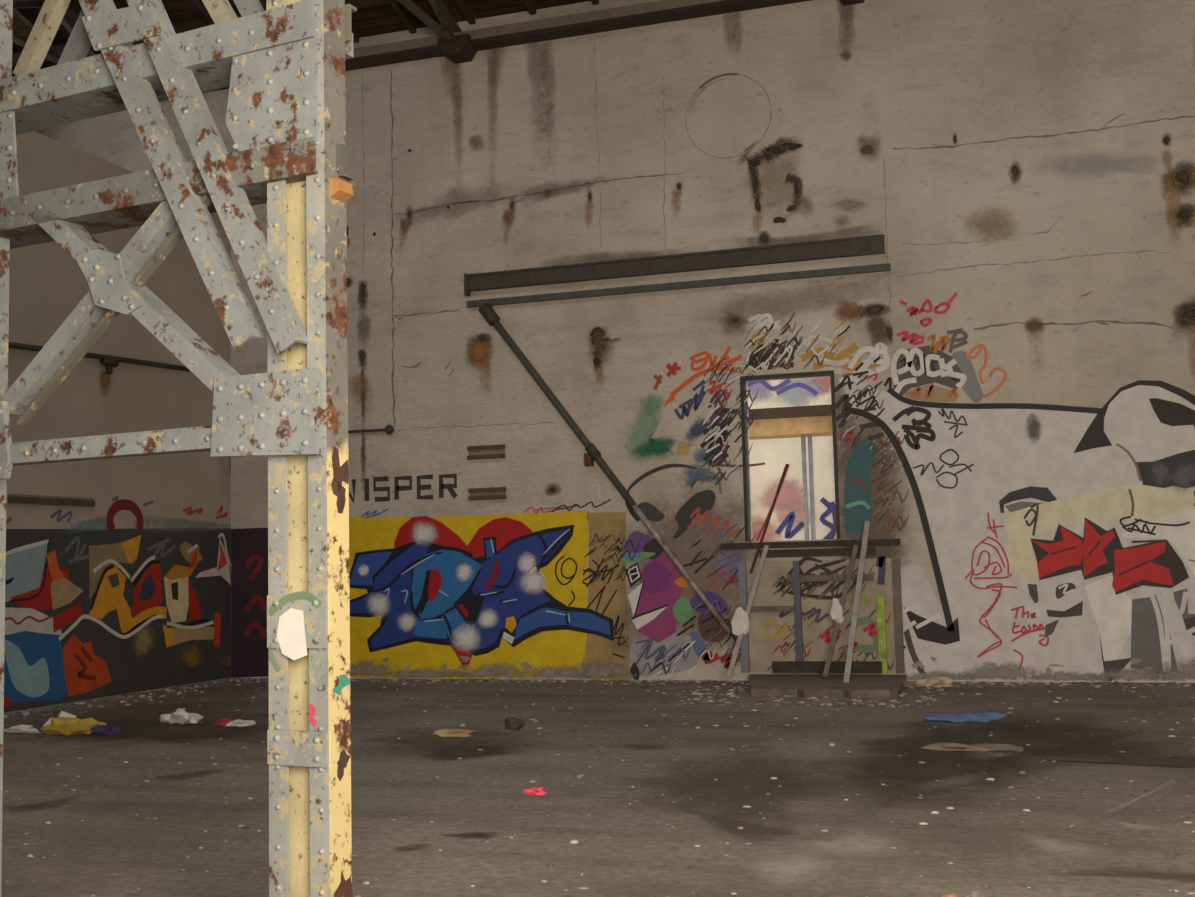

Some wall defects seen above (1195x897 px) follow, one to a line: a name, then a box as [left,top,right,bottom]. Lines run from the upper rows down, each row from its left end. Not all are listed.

crack [830,113,1195,317]
rust [354,350,366,415]
rust [331,433,365,513]
rust [337,750,350,781]
rust [334,870,353,897]